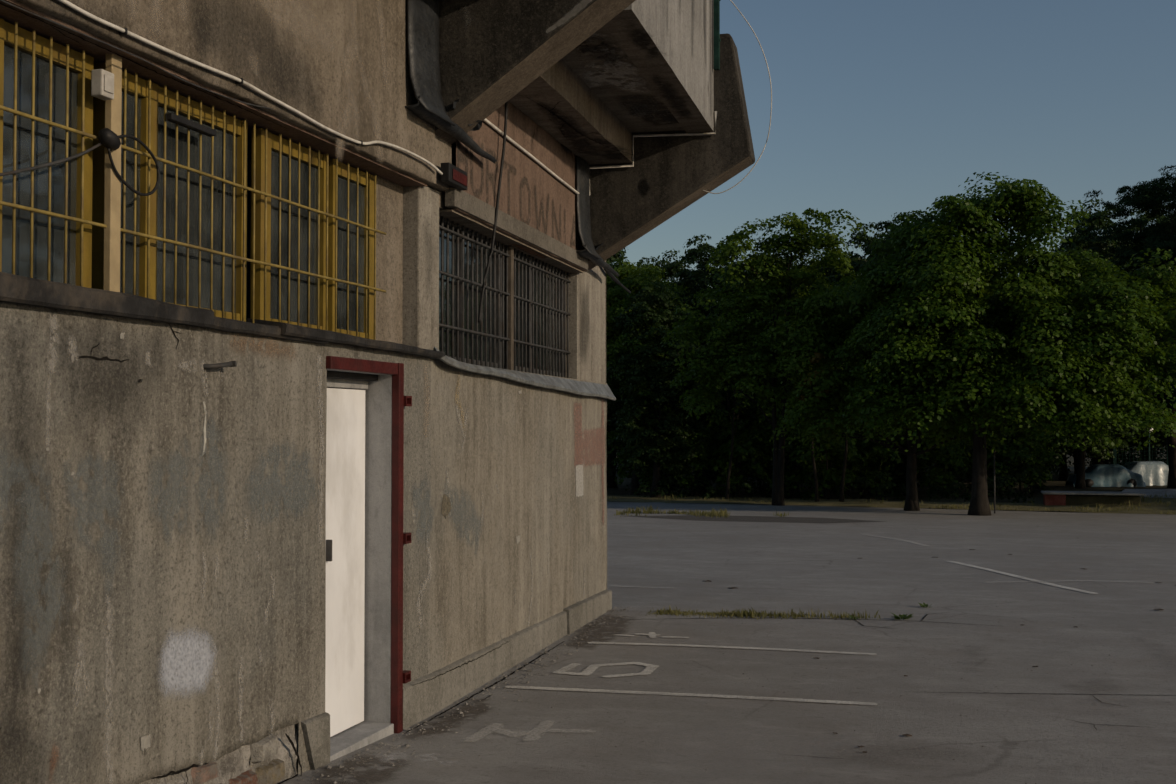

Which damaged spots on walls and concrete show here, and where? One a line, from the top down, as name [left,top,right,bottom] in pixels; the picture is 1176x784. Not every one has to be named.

water stain [576,30,690,125]
crack [74,343,129,363]